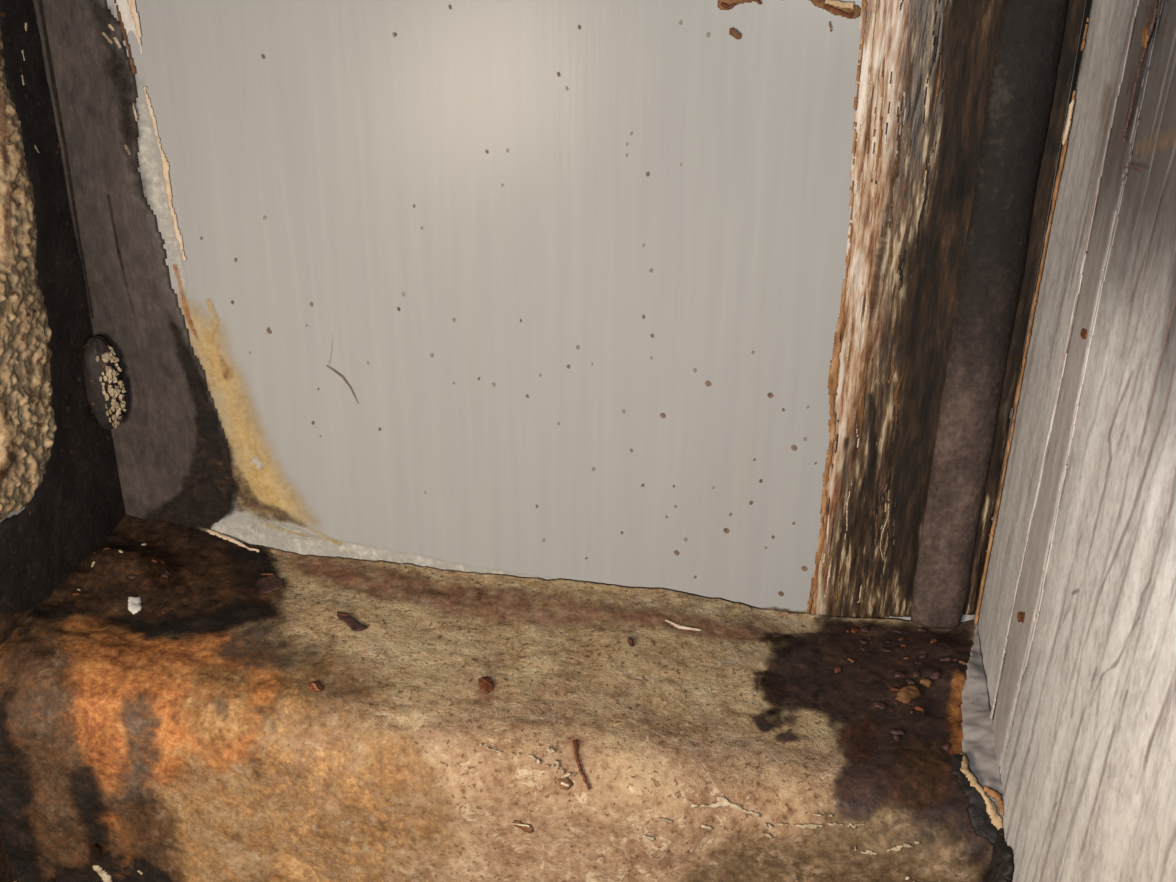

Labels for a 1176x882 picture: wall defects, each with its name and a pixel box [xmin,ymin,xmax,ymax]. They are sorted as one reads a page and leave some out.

peeling [102,0,143,74]
peeling [124,86,197,336]
water stain [856,0,1004,600]
water stain [984,0,1091,499]
water stain [29,301,315,668]
water stain [0,692,171,882]